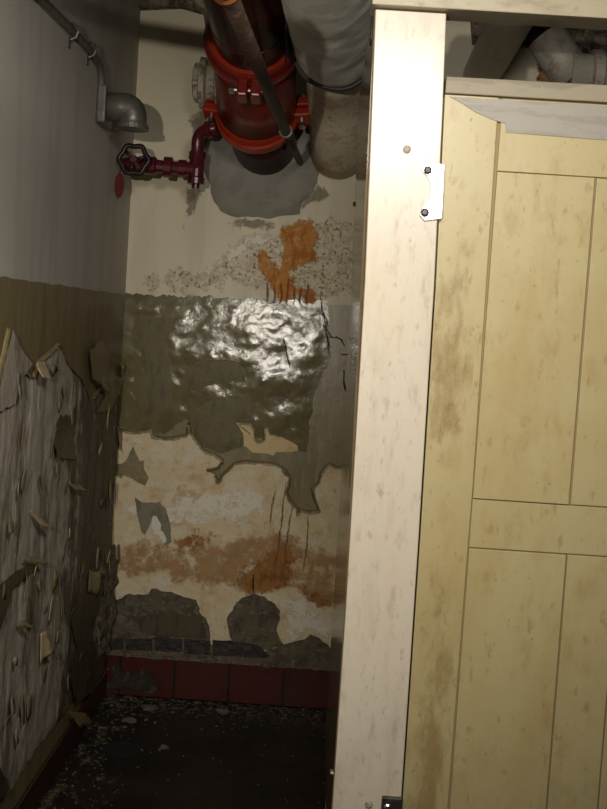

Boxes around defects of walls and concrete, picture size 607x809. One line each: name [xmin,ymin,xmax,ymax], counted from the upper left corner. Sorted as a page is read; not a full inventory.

peeling [143,216,353,303]
rust [253,219,319,305]
crack [319,296,348,392]
peeling [0,327,342,809]